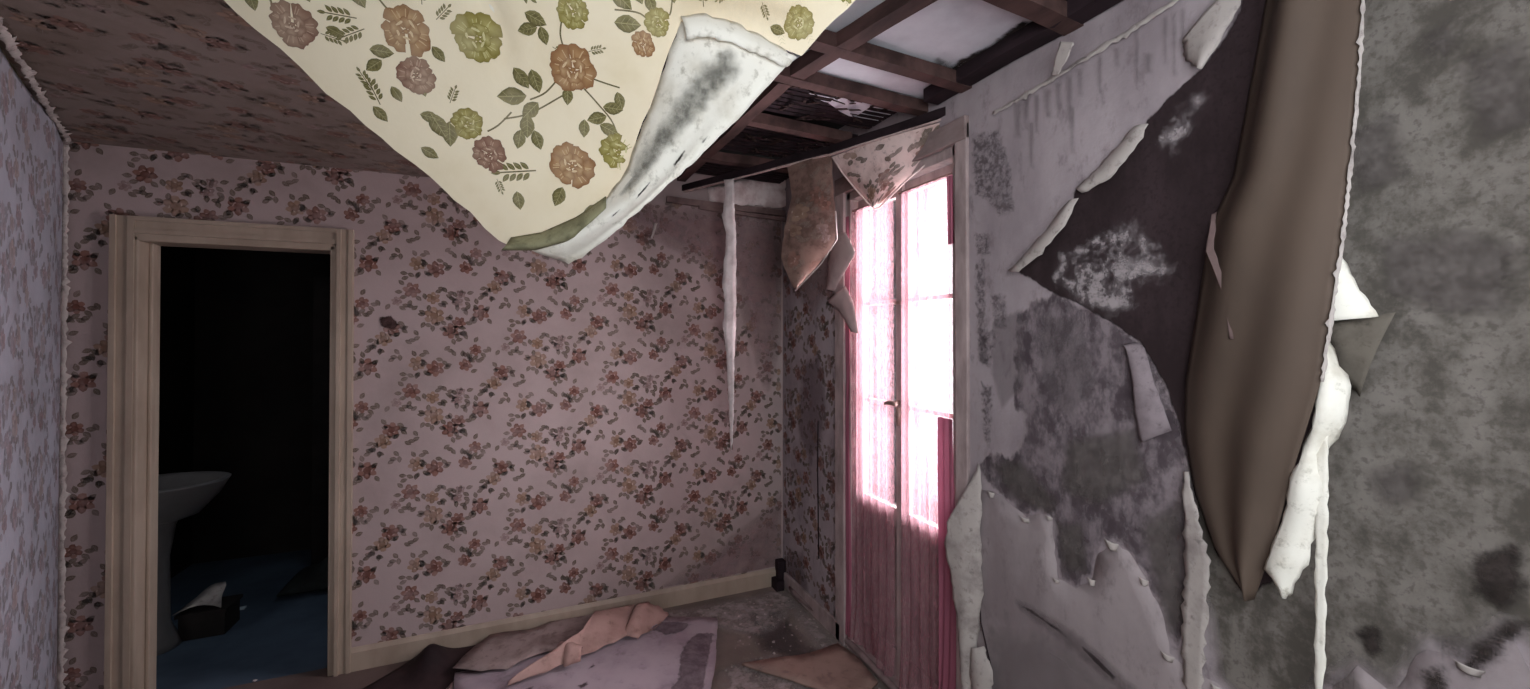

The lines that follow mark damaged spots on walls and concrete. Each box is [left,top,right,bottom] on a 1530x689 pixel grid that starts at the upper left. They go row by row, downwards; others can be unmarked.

peeling [0,17,72,689]
leakage [613,56,779,358]
leakage [799,253,829,304]
peeling [975,234,1005,364]
peeling [974,0,1179,214]
leakage [981,0,1530,689]